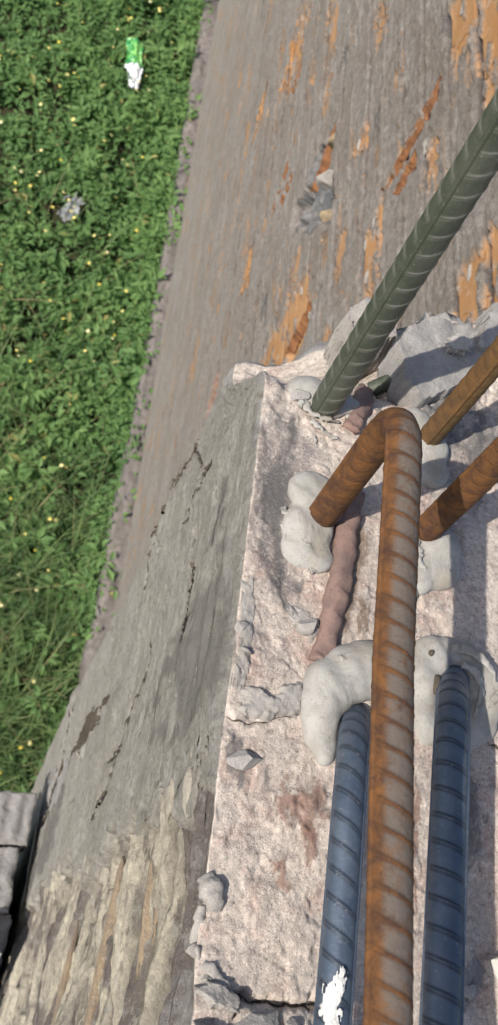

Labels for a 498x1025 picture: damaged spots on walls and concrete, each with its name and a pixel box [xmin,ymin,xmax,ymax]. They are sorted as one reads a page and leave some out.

peeling [444,0,498,93]
spalling [273,124,336,235]
peeling [348,127,371,162]
spalling [380,75,441,207]
peeling [352,211,380,289]
peeling [261,277,312,366]
peeling [444,242,498,357]
crack [138,439,212,610]
peeling [228,577,255,705]
crack [232,994,315,1019]
spalling [464,959,487,1012]